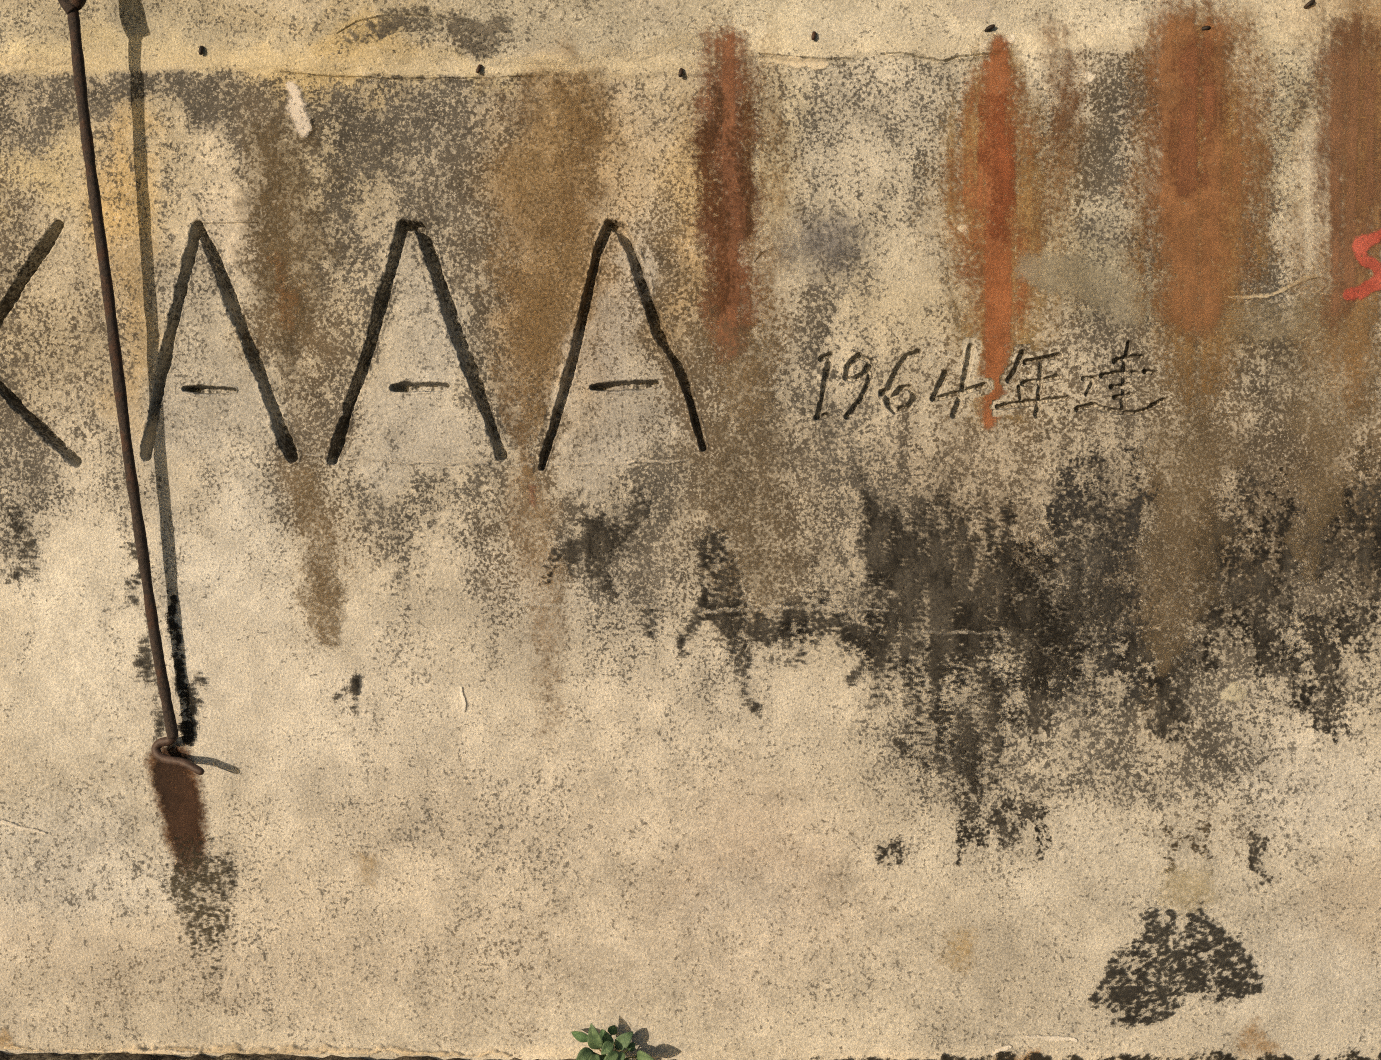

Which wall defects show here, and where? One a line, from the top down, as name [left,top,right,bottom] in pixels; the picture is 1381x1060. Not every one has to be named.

corrosion [696,31,776,362]
corrosion [944,28,1081,429]
corrosion [1135,2,1270,389]
corrosion [1315,0,1381,398]
mould [636,602,656,640]
mould [675,444,1381,873]
corrosion [147,745,246,985]
mould [1086,901,1263,1029]
mould [1248,829,1281,886]